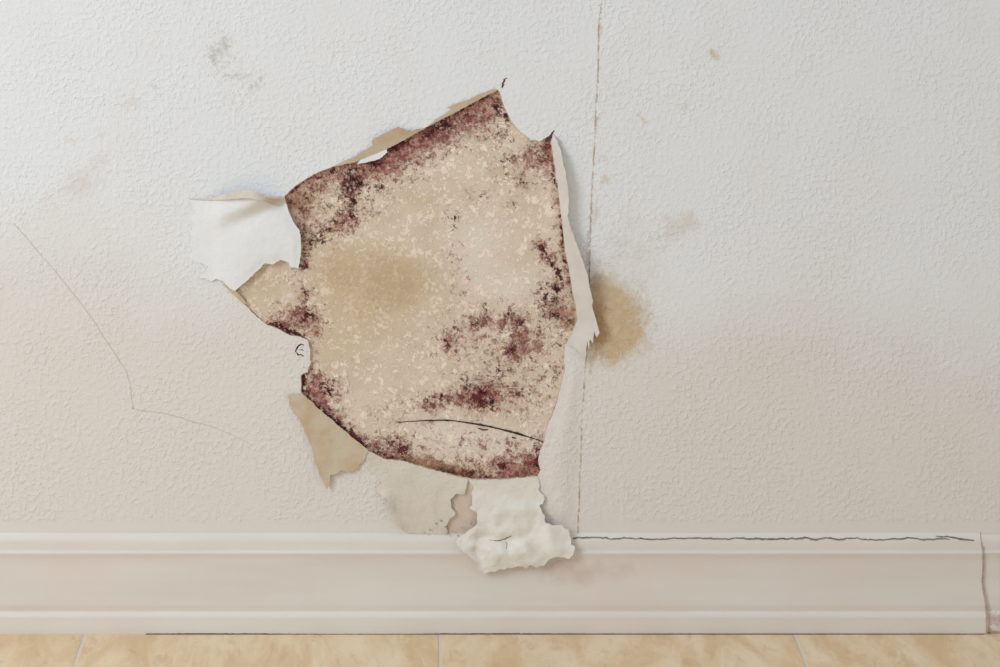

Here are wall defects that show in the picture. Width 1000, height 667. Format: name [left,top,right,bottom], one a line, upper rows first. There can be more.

crack [586,0,601,280]
peeling [187,89,600,574]
leakage [266,91,578,478]
leakage [590,282,642,361]
crack [146,358,1000,635]